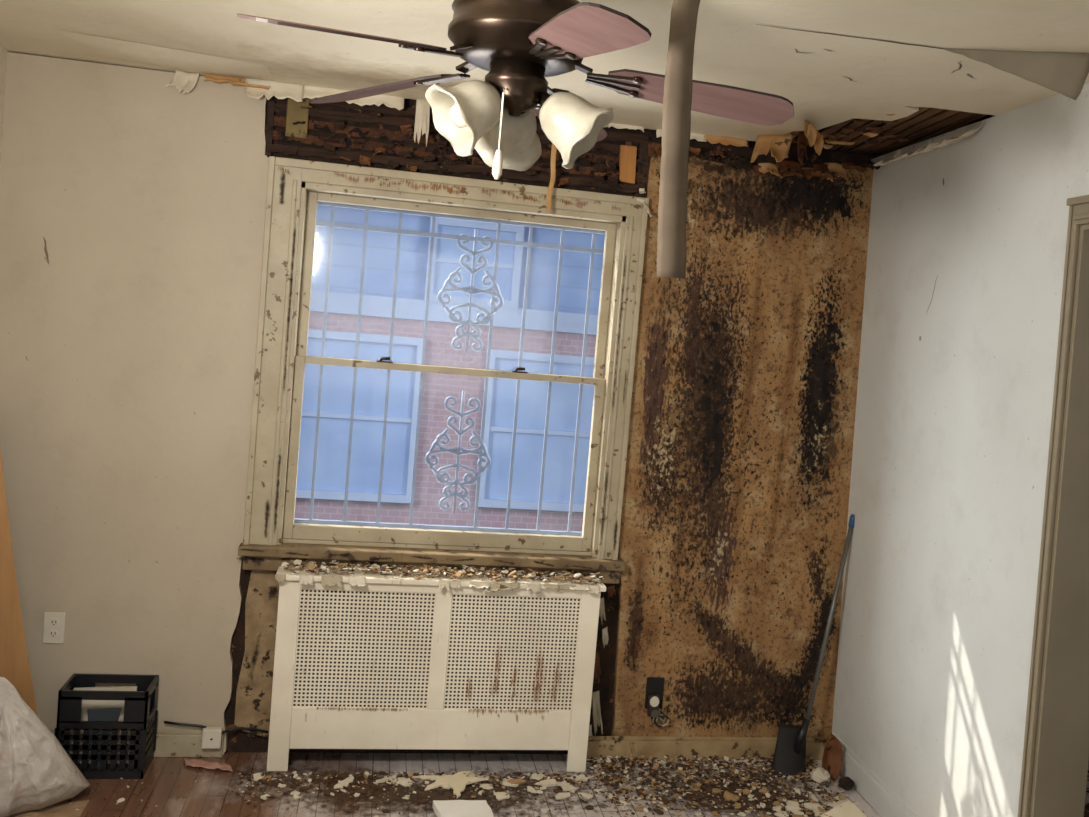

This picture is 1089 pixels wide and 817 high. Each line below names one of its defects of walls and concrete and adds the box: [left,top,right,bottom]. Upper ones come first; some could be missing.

flaking render [166,69,995,741]
damp [624,155,867,731]